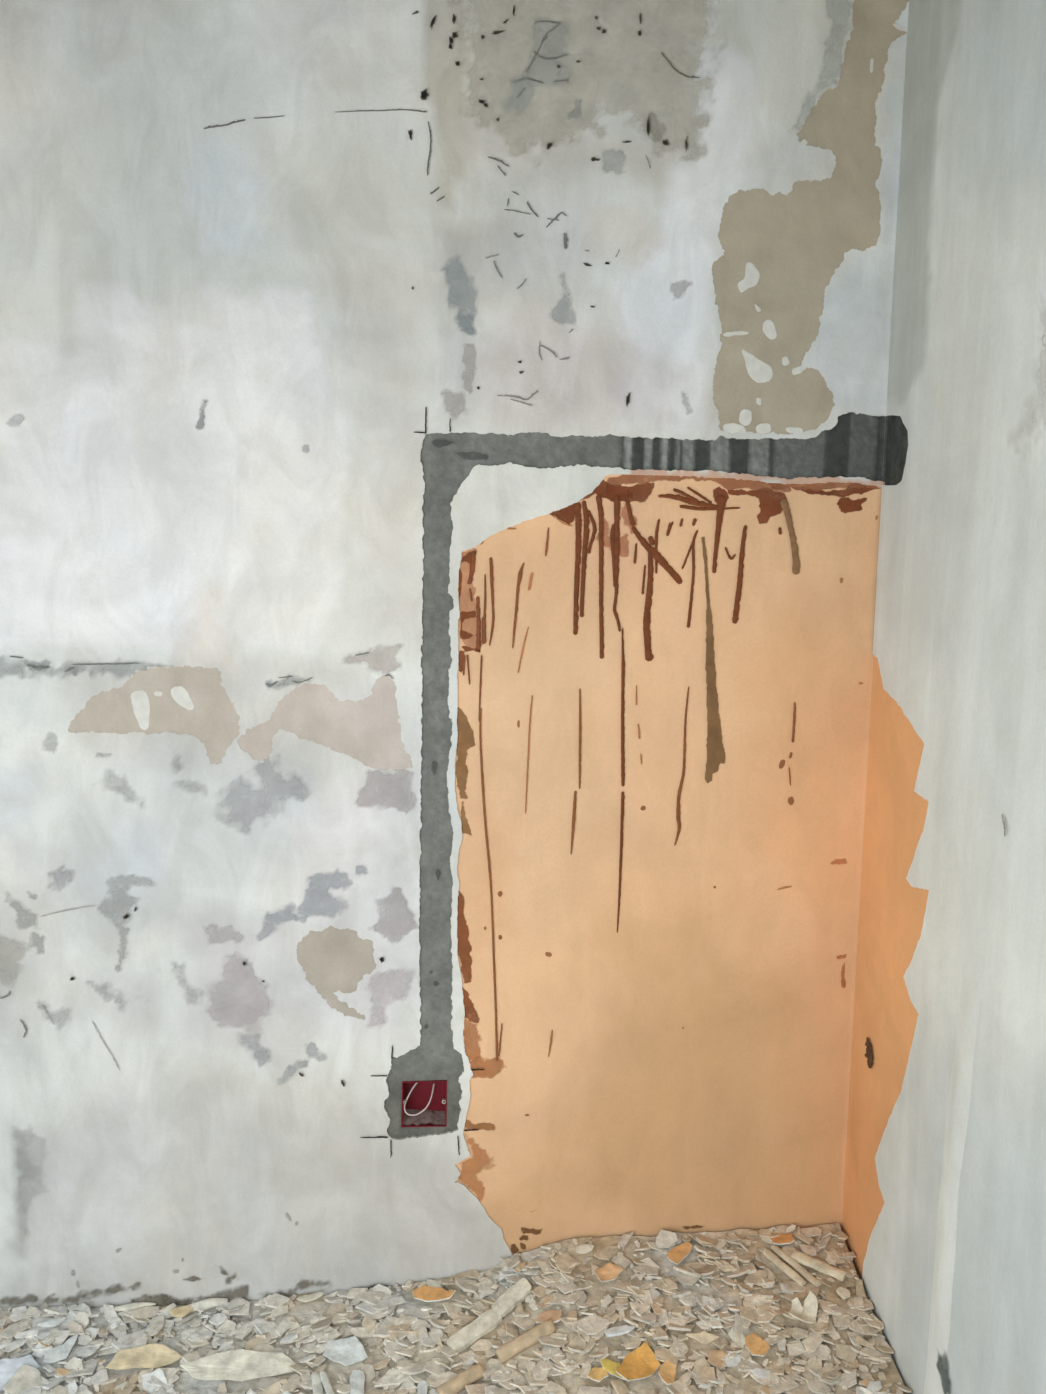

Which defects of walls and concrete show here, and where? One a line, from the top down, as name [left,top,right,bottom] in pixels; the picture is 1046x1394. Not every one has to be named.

flaking render [412,11,460,66]
crack [661,52,700,78]
crack [203,116,282,129]
crack [342,109,445,202]
flaking render [646,116,688,151]
peeling [712,0,909,435]
corrosion [549,475,879,557]
peeling [68,665,413,771]
peeling [455,474,929,1300]
peeling [296,926,384,1020]
corrosion [837,954,846,988]